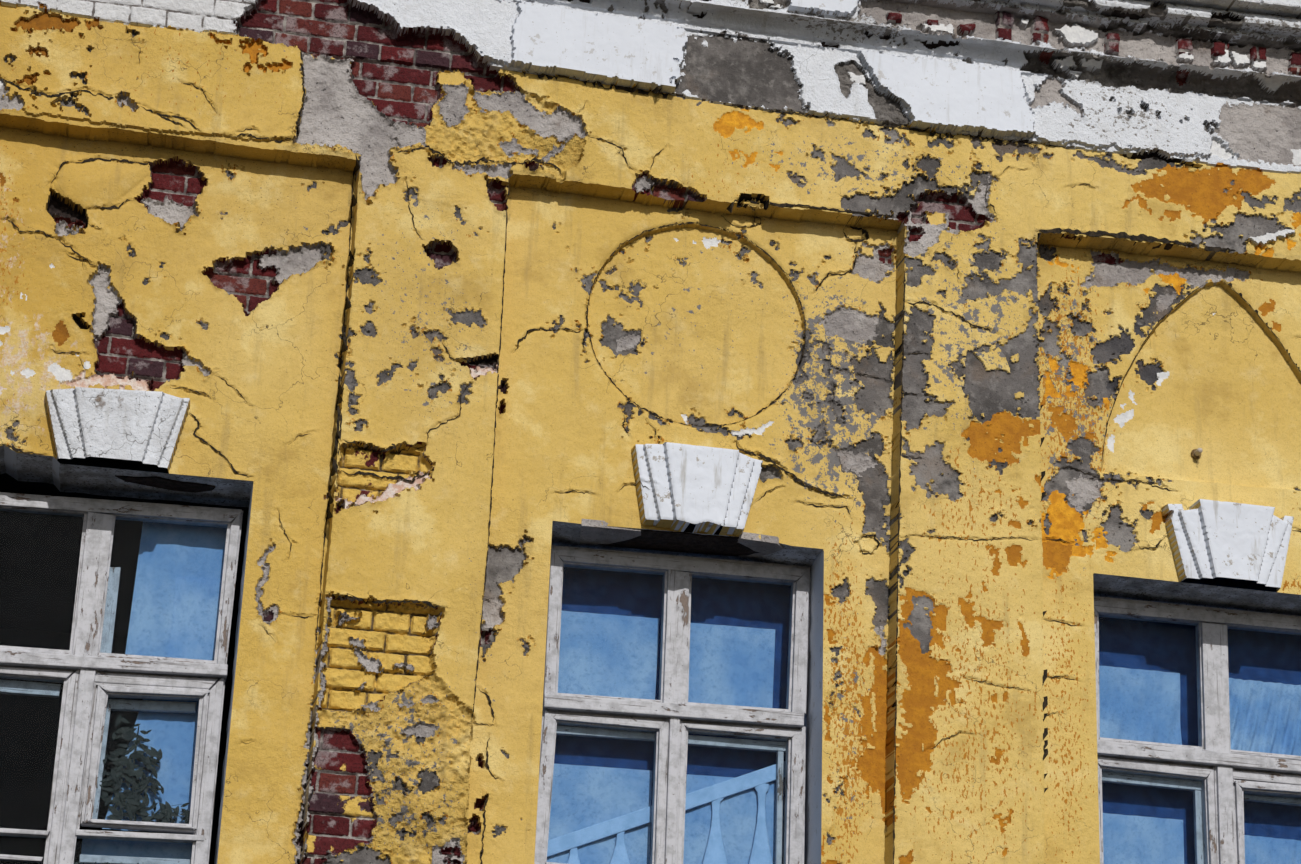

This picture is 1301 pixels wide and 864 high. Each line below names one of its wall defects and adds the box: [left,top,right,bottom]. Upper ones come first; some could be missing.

spalling [52,263,210,391]
crack [2,49,305,143]
spalling [135,156,207,233]
crack [177,371,249,476]
spalling [203,220,350,316]
spalling [323,302,434,514]
spalling [210,0,588,211]
crack [263,145,1079,864]
peeling [675,0,810,188]
crack [1037,228,1236,252]
crack [1039,283,1301,501]
spalling [292,596,506,864]